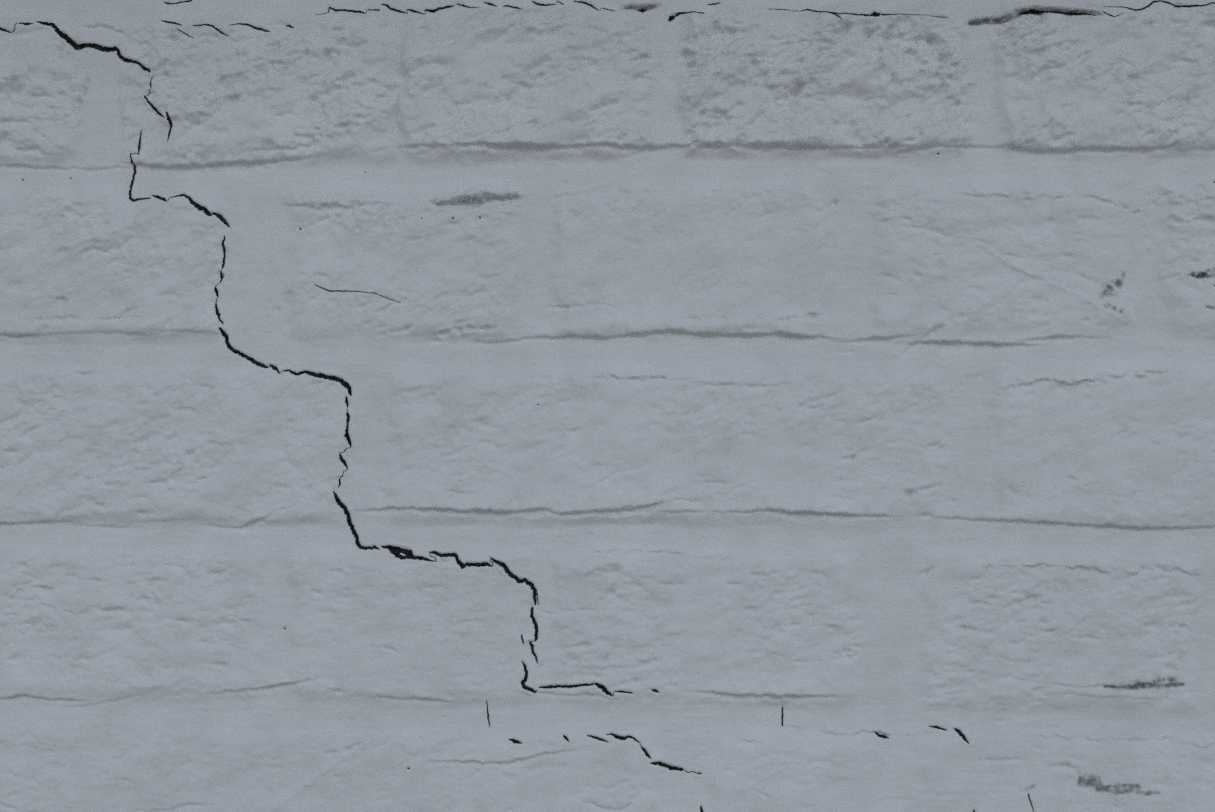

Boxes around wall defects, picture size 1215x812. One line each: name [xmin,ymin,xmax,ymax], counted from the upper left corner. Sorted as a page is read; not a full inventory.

crack [161,0,614,38]
crack [668,2,721,21]
crack [776,9,945,19]
crack [1102,0,1215,17]
crack [0,21,659,696]
crack [486,701,522,744]
crack [929,726,969,744]